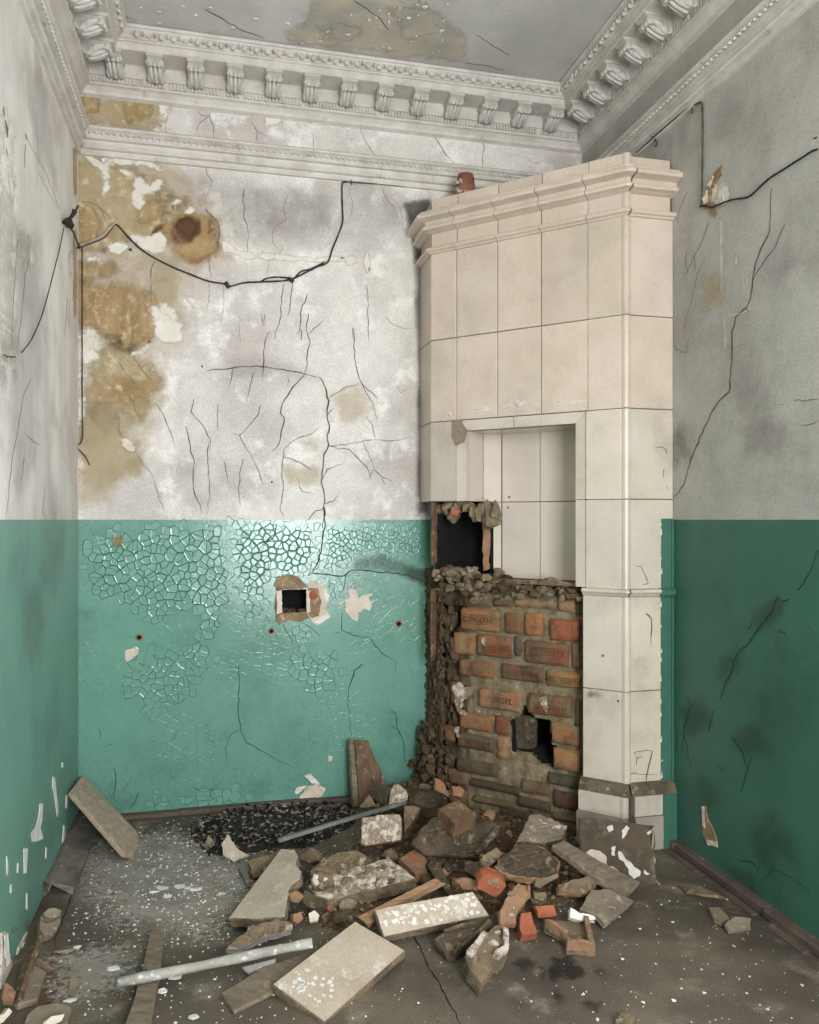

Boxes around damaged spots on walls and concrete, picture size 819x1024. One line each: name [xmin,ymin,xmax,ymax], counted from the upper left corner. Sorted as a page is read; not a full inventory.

crack [3,107,115,222]
spalling [702,166,724,217]
damp [69,148,190,433]
crack [656,189,785,497]
crack [6,382,45,514]
crack [117,169,422,731]
spalling [274,574,374,625]
crack [631,550,819,791]
peeling [6,762,77,893]
peeling [701,806,719,847]
spalling [0,931,28,989]
crack [414,936,461,1024]